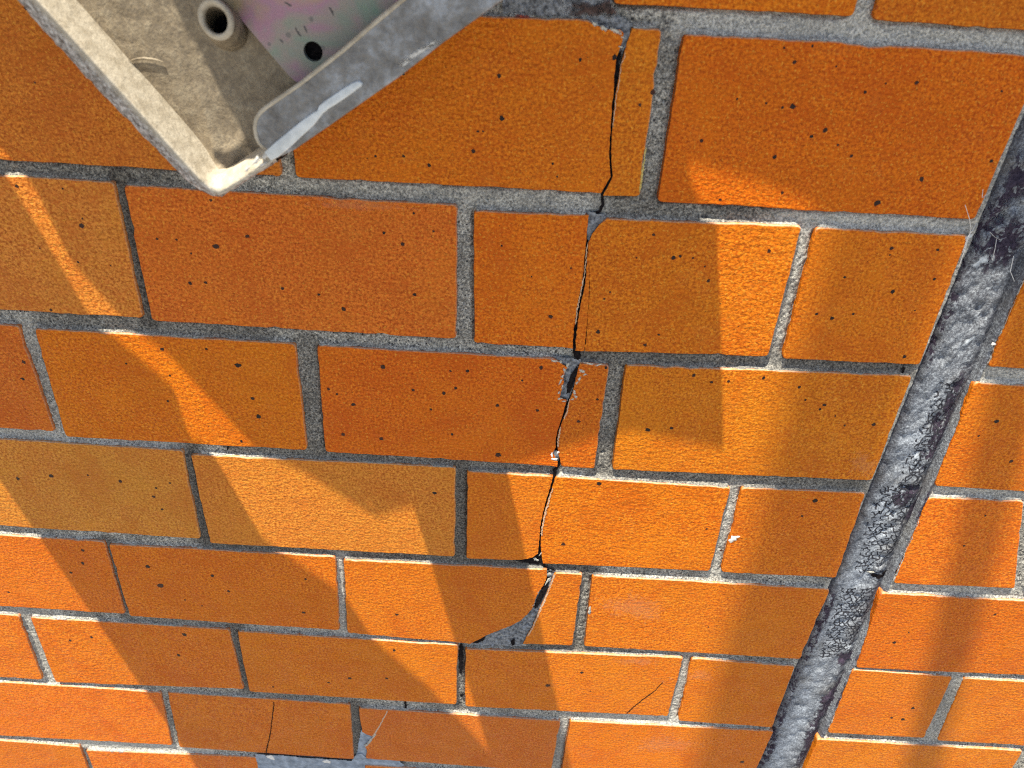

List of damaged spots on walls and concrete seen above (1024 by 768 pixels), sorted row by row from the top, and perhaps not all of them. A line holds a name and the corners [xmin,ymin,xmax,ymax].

crack [595,50,625,214]
crack [527,237,590,637]
spalling [552,356,602,402]
spalling [468,552,555,647]